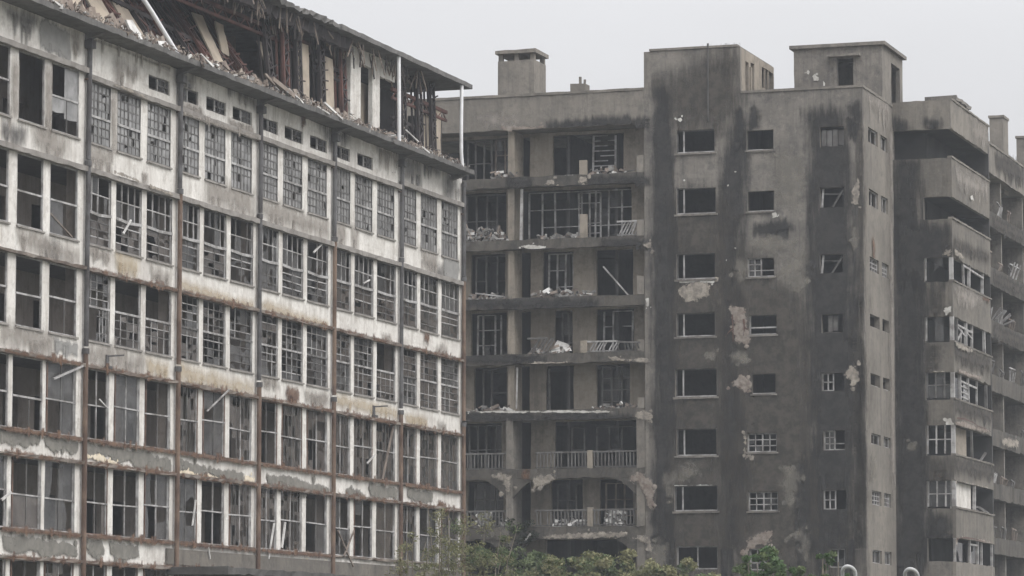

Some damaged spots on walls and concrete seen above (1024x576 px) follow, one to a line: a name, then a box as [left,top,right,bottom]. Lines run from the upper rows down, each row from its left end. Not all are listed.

spalling [678,248,747,302]
damp [546,52,994,576]
spalling [726,306,752,393]
spalling [844,360,861,391]
peeling [0,429,329,498]
spalling [491,472,517,497]
spalling [531,470,558,492]
spalling [629,462,701,509]
peeling [2,534,139,563]
spalling [740,526,808,561]